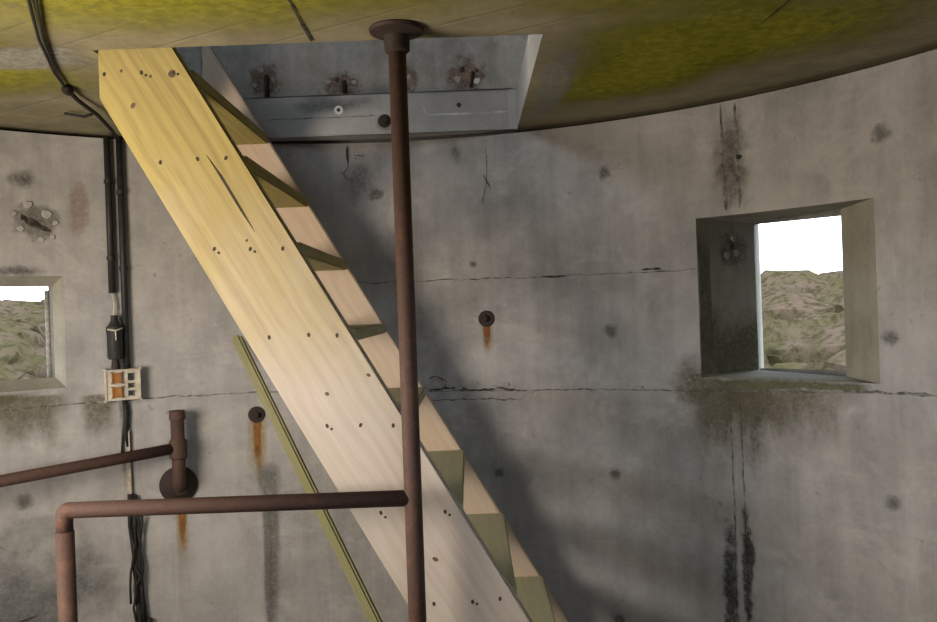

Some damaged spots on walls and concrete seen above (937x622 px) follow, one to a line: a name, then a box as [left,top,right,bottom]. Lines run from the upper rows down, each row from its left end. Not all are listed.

crack [0,391,279,412]
rust [253,422,264,464]
rust [178,514,186,545]
leakage [263,511,278,609]
crack [424,376,937,622]
leakage [742,510,755,620]